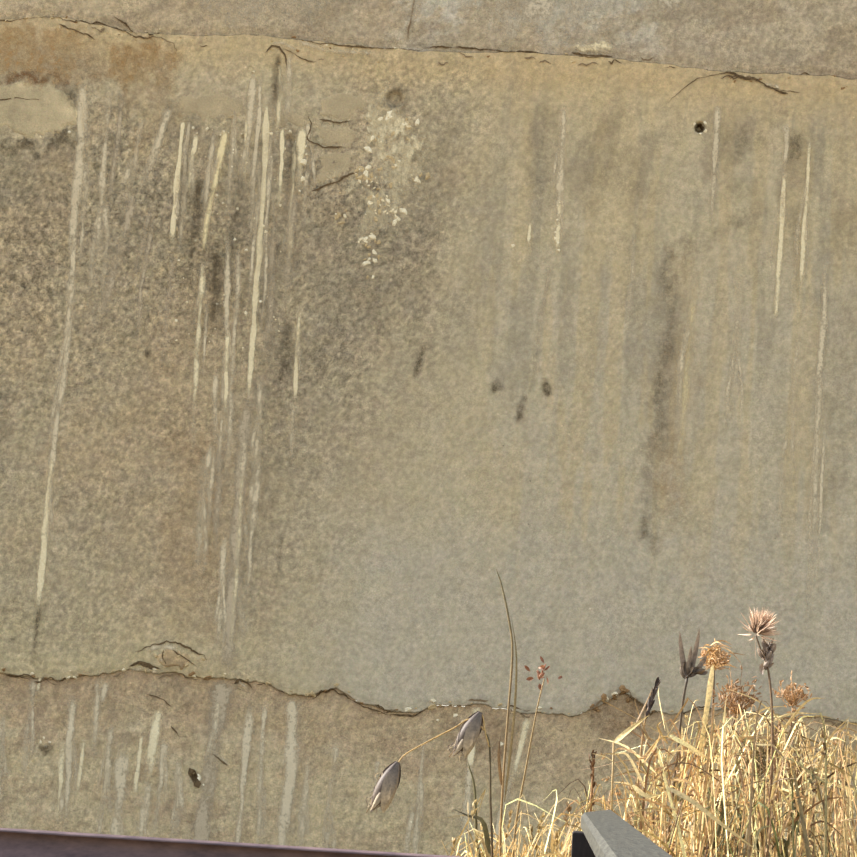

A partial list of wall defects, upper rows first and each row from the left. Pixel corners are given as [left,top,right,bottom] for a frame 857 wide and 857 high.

crack [0,15,176,49]
crack [266,0,612,67]
peeling [0,81,77,156]
spalling [269,93,430,279]
water stain [775,178,786,314]
water stain [34,57,315,663]
spalling [1,668,85,685]
crack [129,640,206,673]
spalling [145,648,226,681]
crack [311,688,425,717]
water stain [58,683,184,836]
water stain [277,700,309,845]